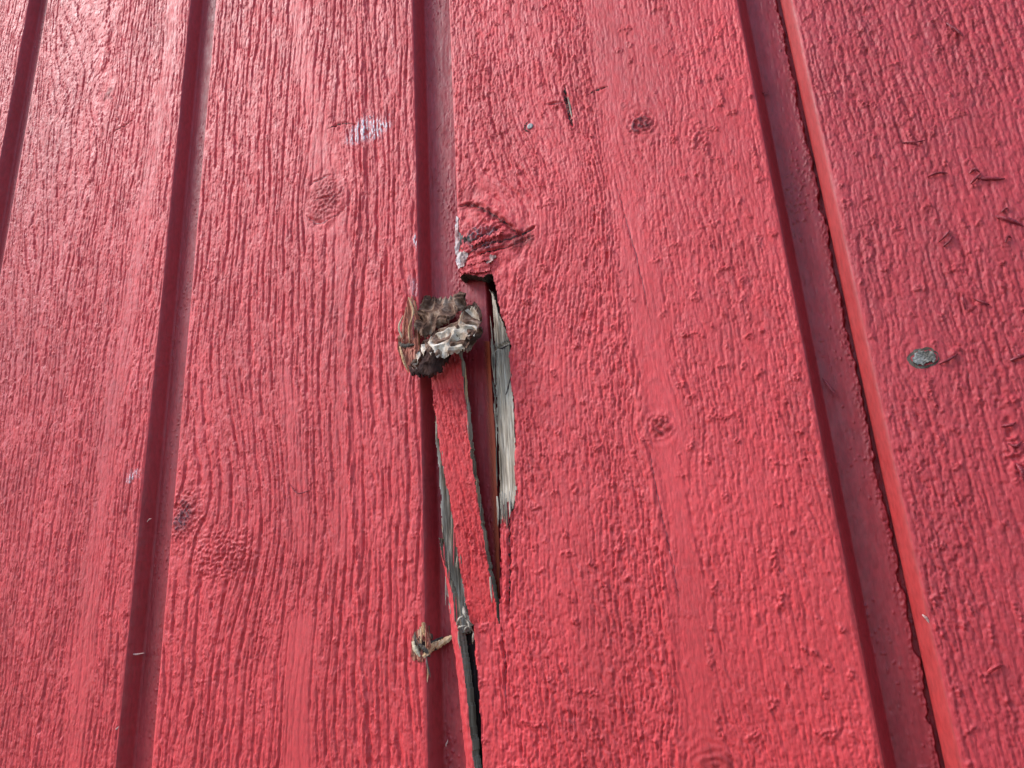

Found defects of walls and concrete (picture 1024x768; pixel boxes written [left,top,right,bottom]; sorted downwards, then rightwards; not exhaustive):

spalling [431,290,518,768]
crack [501,519,511,713]